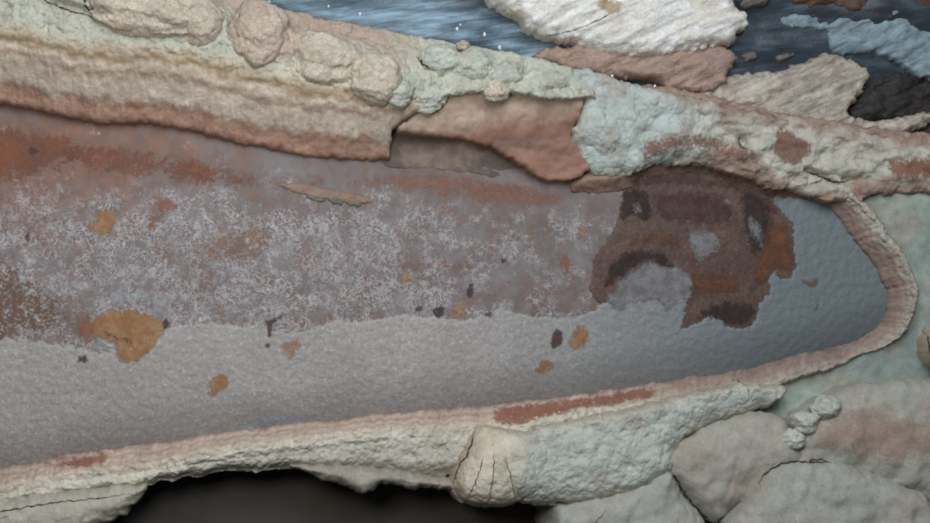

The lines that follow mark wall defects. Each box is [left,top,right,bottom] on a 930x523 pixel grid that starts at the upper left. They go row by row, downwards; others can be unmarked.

spalling [382,128,523,178]
corrosion [0,262,65,338]
corrosion [77,309,164,362]
leakage [0,182,919,506]
corrosion [208,374,228,396]
corrosion [493,388,653,425]
crack [453,434,474,485]
crack [758,459,832,484]
crack [0,494,129,519]